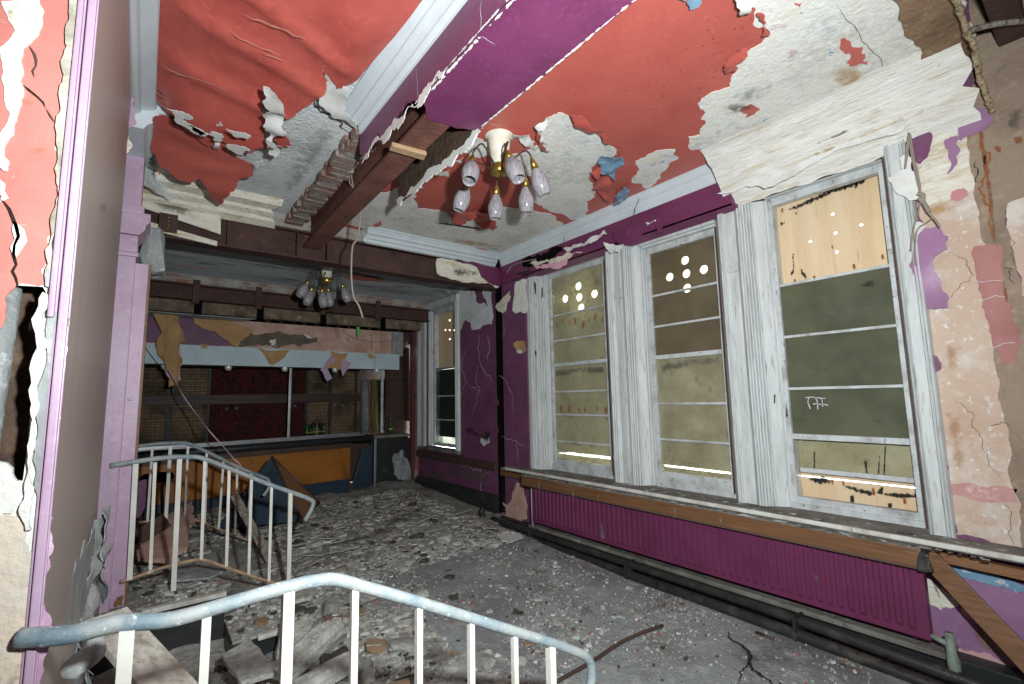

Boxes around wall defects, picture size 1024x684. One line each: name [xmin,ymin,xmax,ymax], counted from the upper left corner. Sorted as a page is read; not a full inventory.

spalling [0,0,44,172]
crack [24,47,55,122]
peeling [144,0,422,205]
crack [0,180,27,288]
spalling [18,0,78,530]
peeling [348,112,678,253]
spalling [457,218,664,331]
spalling [688,0,1024,548]
crack [460,324,520,459]
peeling [65,505,124,625]
flaking render [503,482,528,521]
crack [728,631,775,684]